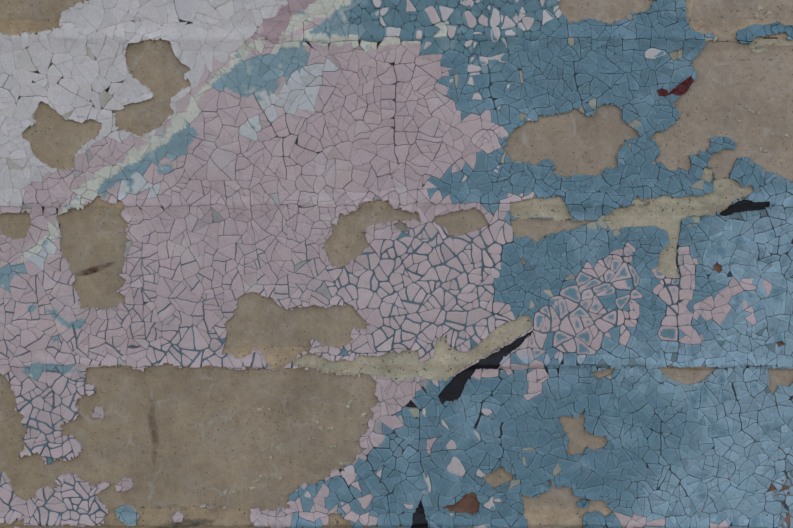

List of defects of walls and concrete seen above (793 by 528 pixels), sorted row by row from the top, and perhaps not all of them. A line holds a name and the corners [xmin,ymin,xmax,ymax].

peeling [775,460,785,473]
peeling [772,474,791,490]
peeling [356,494,373,510]
peeling [758,502,788,528]
peeling [777,486,793,528]